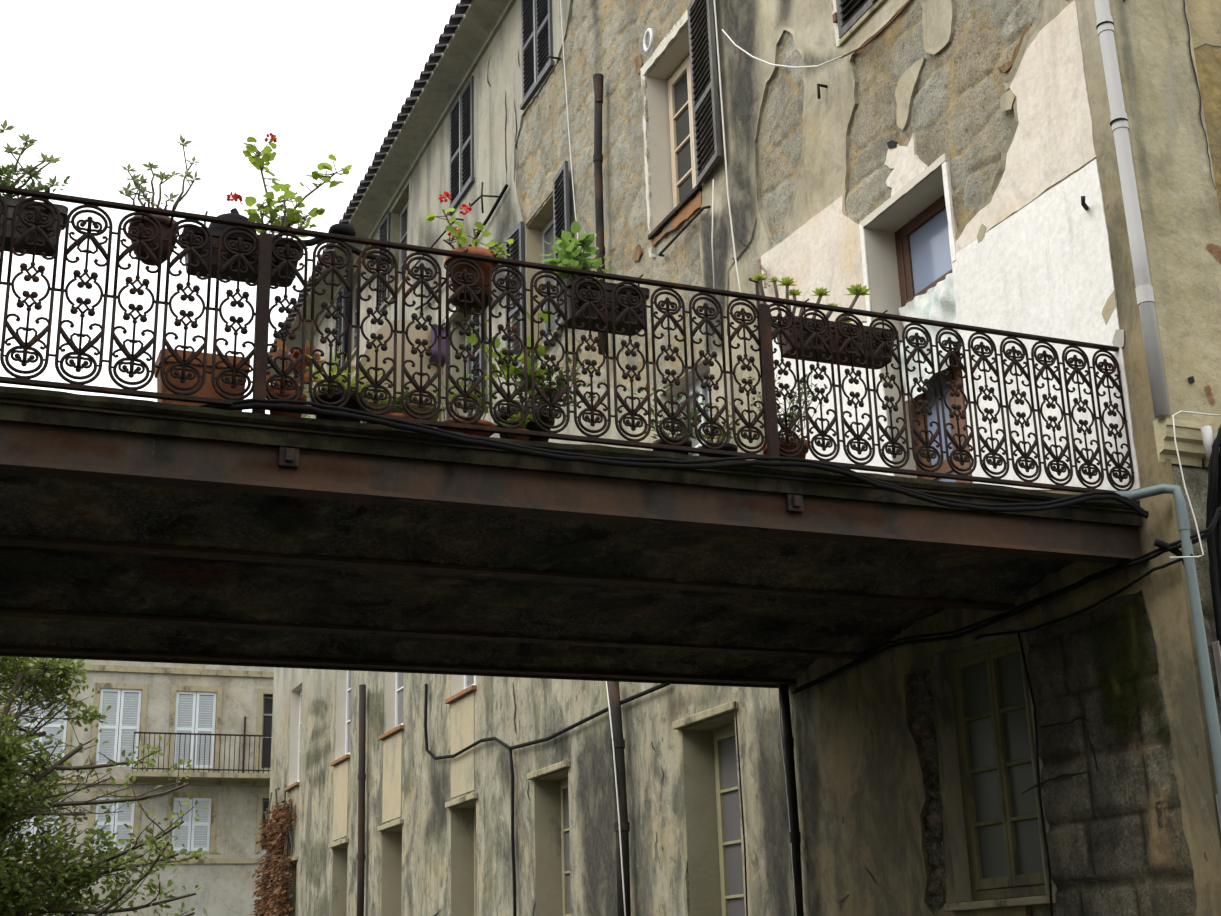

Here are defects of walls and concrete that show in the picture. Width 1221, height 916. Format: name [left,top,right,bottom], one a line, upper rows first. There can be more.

damp [702,0,756,351]
flaking render [753,26,807,246]
flaking render [843,0,1044,243]